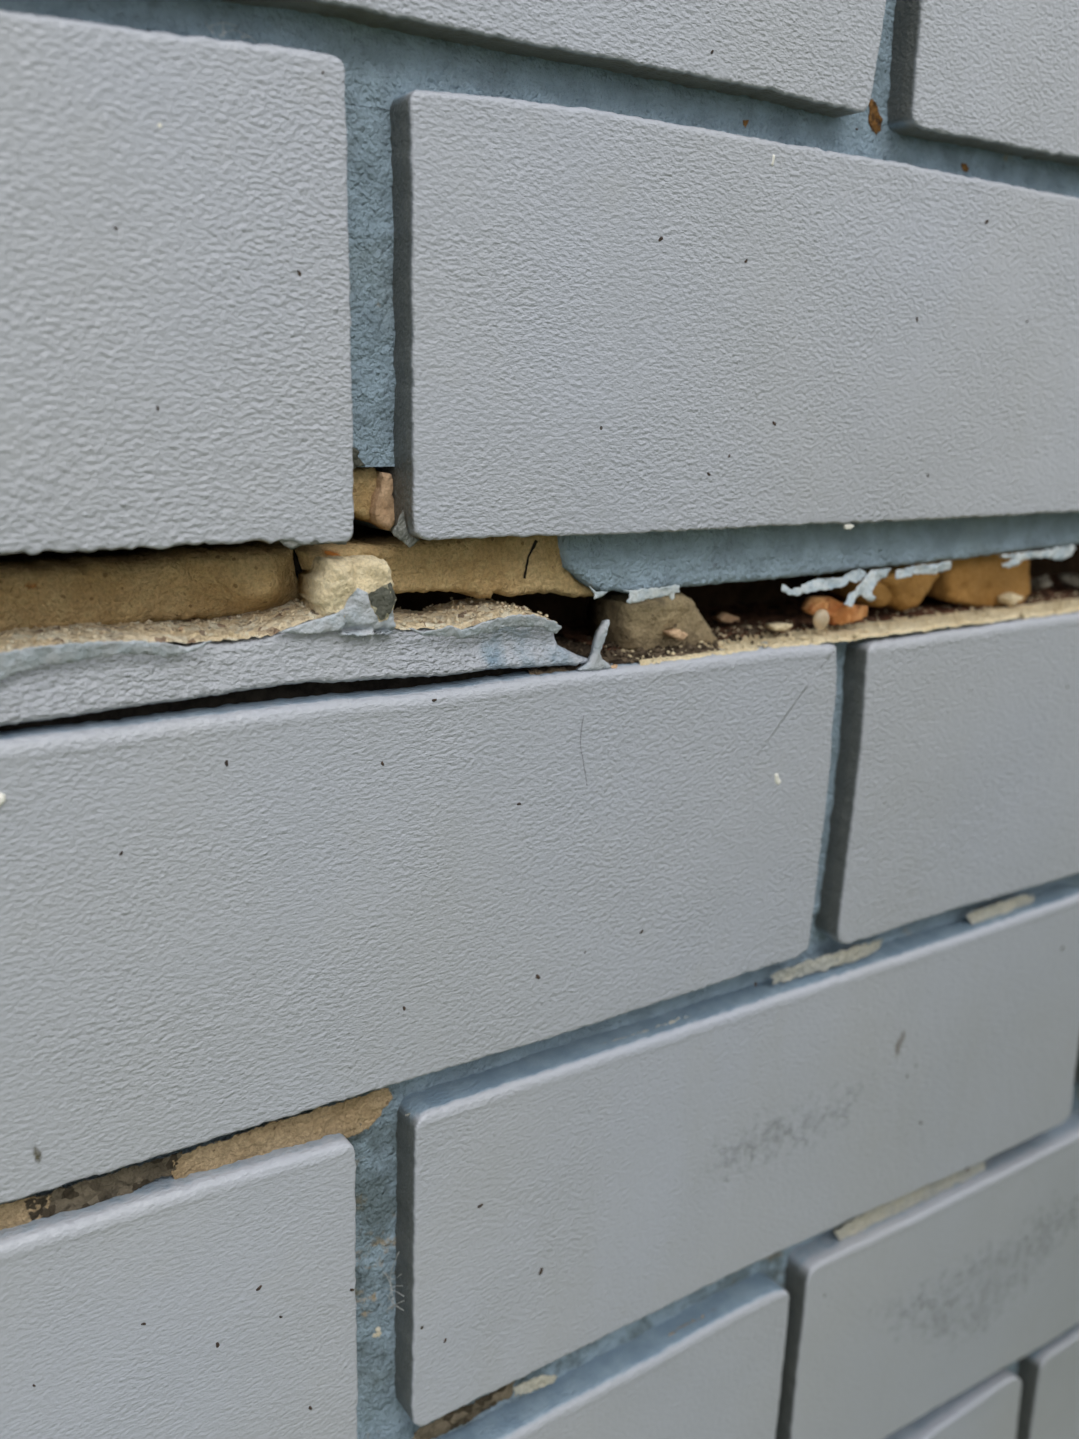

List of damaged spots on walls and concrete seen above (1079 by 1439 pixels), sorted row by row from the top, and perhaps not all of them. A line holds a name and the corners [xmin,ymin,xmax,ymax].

spalling [0,448,680,632]
peeling [998,545,1075,568]
peeling [781,561,952,607]
spalling [663,628,688,641]
spalling [712,612,740,623]
peeling [171,1088,393,1180]
peeling [0,1195,51,1230]
peeling [513,1375,557,1396]